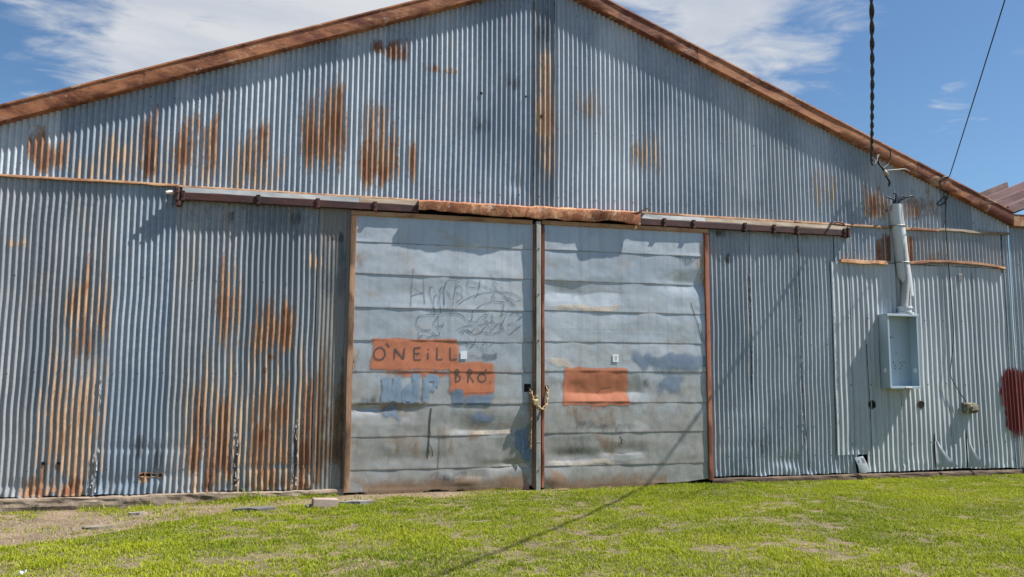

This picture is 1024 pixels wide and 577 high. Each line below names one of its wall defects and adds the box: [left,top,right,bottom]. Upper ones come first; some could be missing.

corrosion [370,39,407,61]
corrosion [27,104,285,189]
corrosion [300,80,347,171]
corrosion [359,102,416,187]
corrosion [535,49,555,171]
corrosion [19,254,112,498]
corrosion [185,257,357,493]